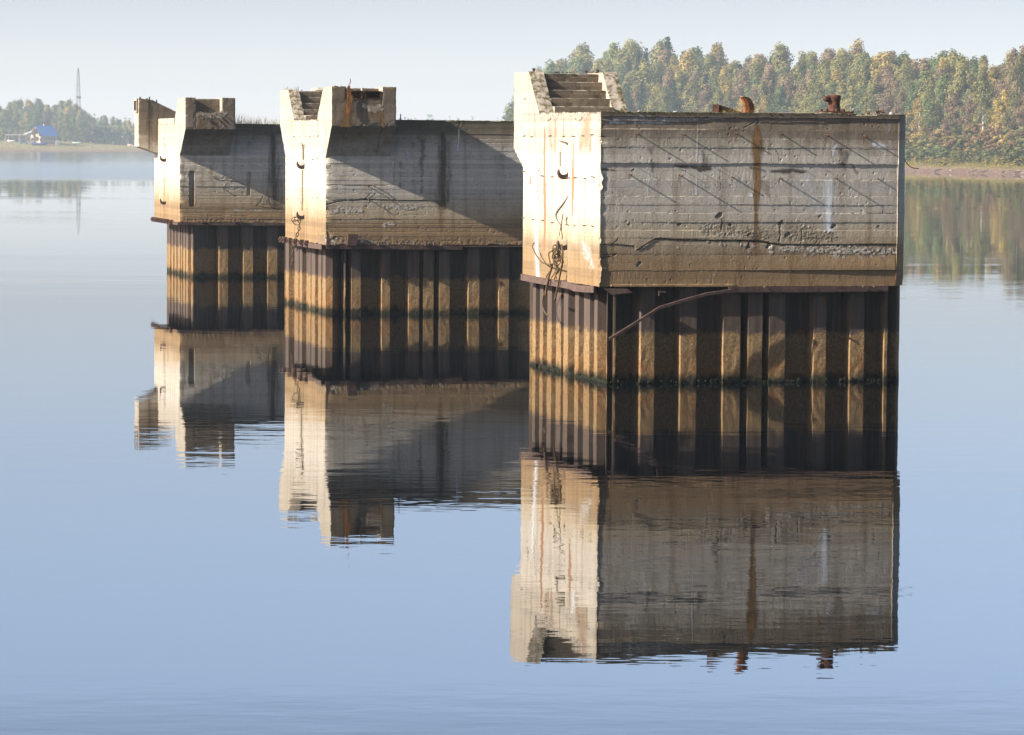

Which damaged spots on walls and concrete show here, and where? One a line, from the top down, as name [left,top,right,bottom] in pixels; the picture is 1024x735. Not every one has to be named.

corrosion [752,124,763,243]
leakage [823,179,833,233]
crack [601,221,897,258]
peeling [739,220,896,259]